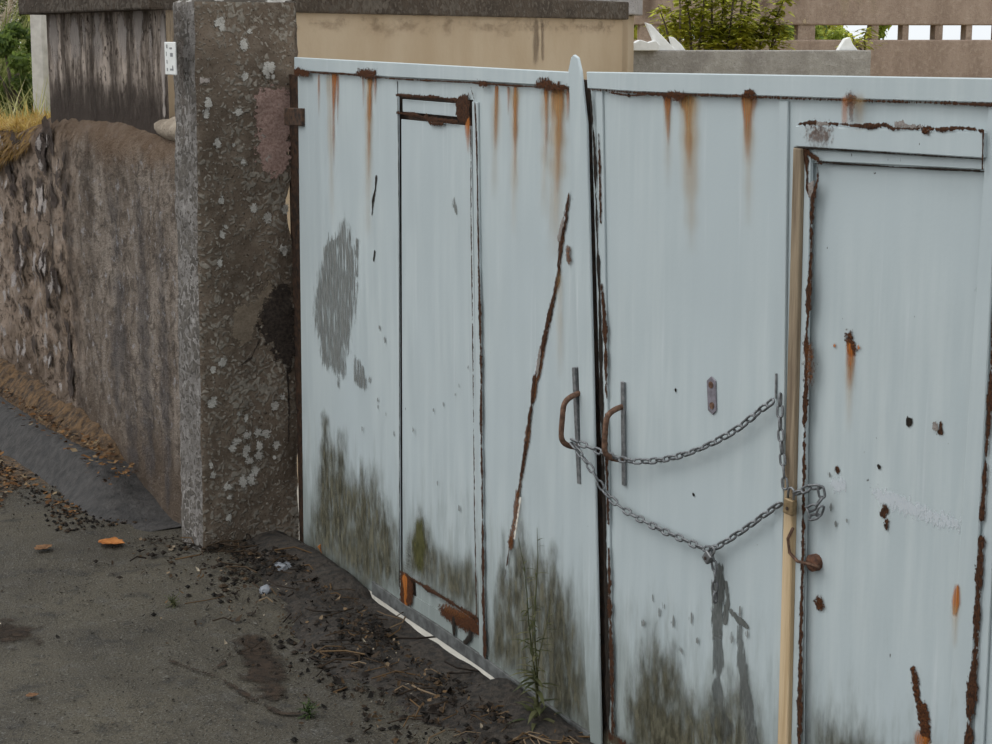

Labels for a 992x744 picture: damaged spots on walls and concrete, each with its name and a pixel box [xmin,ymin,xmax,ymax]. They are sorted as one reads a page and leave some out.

rust [294,66,569,143]
rust [587,88,992,142]
rust [833,329,860,373]
mould [312,420,475,608]
rust [399,570,479,645]
mould [495,553,587,726]
leakage [630,563,759,744]